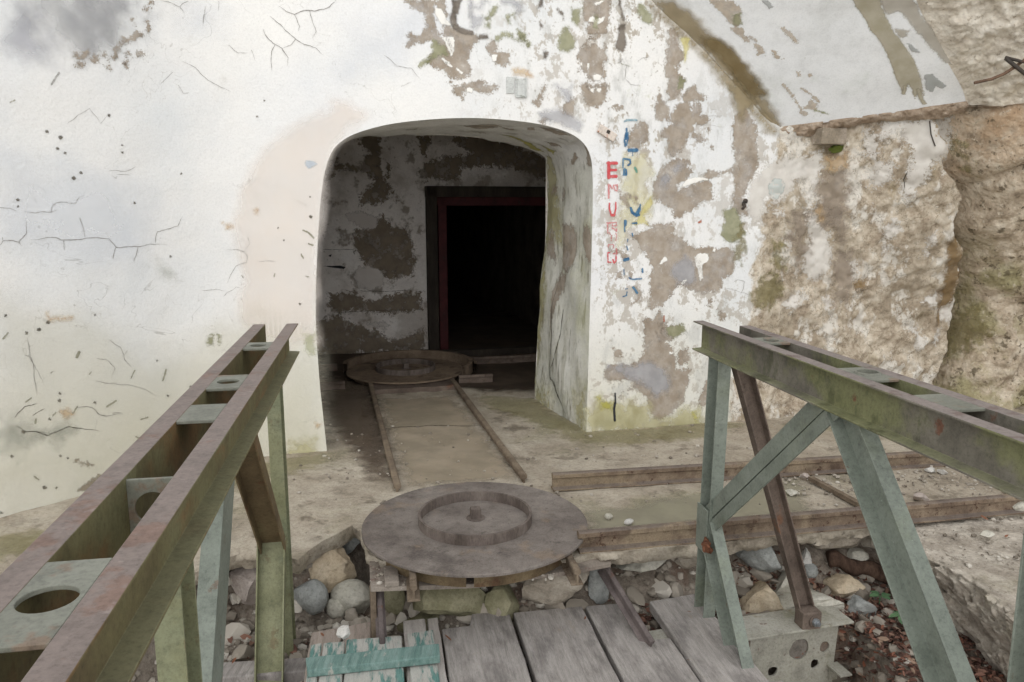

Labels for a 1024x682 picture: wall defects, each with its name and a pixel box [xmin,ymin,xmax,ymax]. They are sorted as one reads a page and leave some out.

leakage [51,0,117,53]
crack [229,0,336,68]
peeling [403,0,624,201]
leakage [637,1,780,133]
peeling [709,0,784,60]
leakage [853,0,950,104]
crack [0,196,181,259]
peeling [316,136,427,355]
peeling [547,223,591,330]
peeling [603,28,969,420]